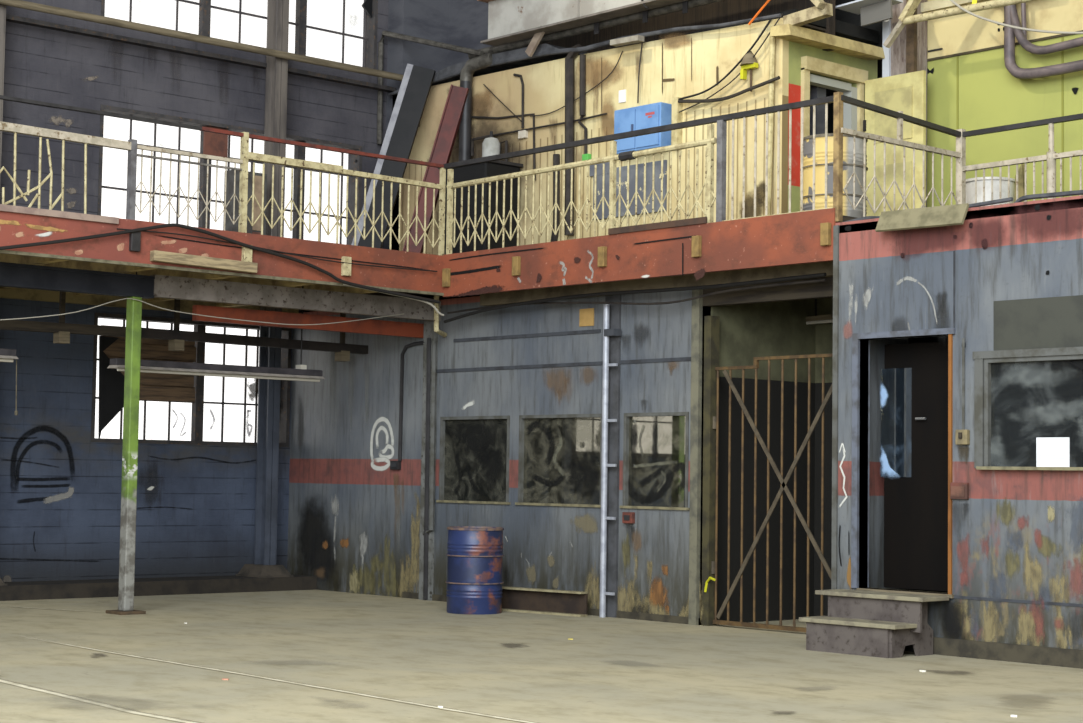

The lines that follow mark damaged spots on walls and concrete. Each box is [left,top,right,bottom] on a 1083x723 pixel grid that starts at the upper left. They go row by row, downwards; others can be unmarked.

rust [650,566,669,615]
peeling [997,501,1083,649]
peeling [958,600,998,642]